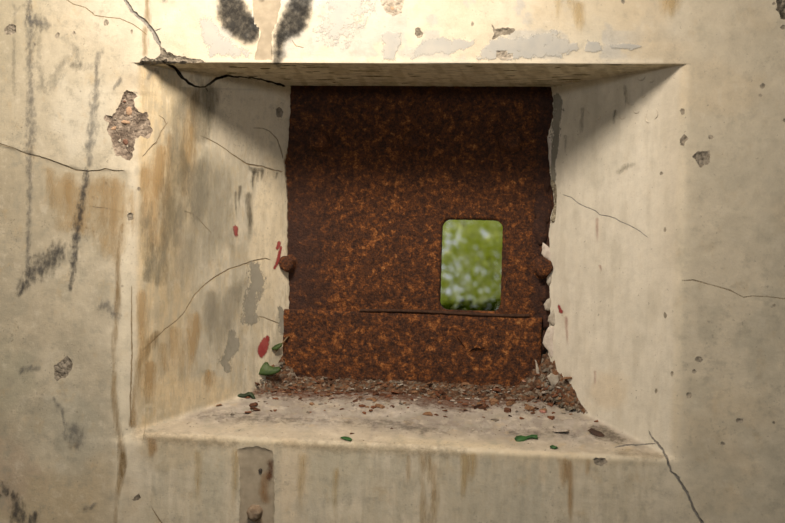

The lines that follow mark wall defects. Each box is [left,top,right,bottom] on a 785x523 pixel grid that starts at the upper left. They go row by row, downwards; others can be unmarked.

crack [67,0,285,88]
spalling [381,0,405,16]
spalling [772,0,785,29]
crack [0,143,125,172]
spalling [104,90,153,160]
leakage [19,171,88,294]
crack [564,195,647,237]
crack [681,279,785,299]
crack [129,258,270,423]
crack [617,432,704,523]